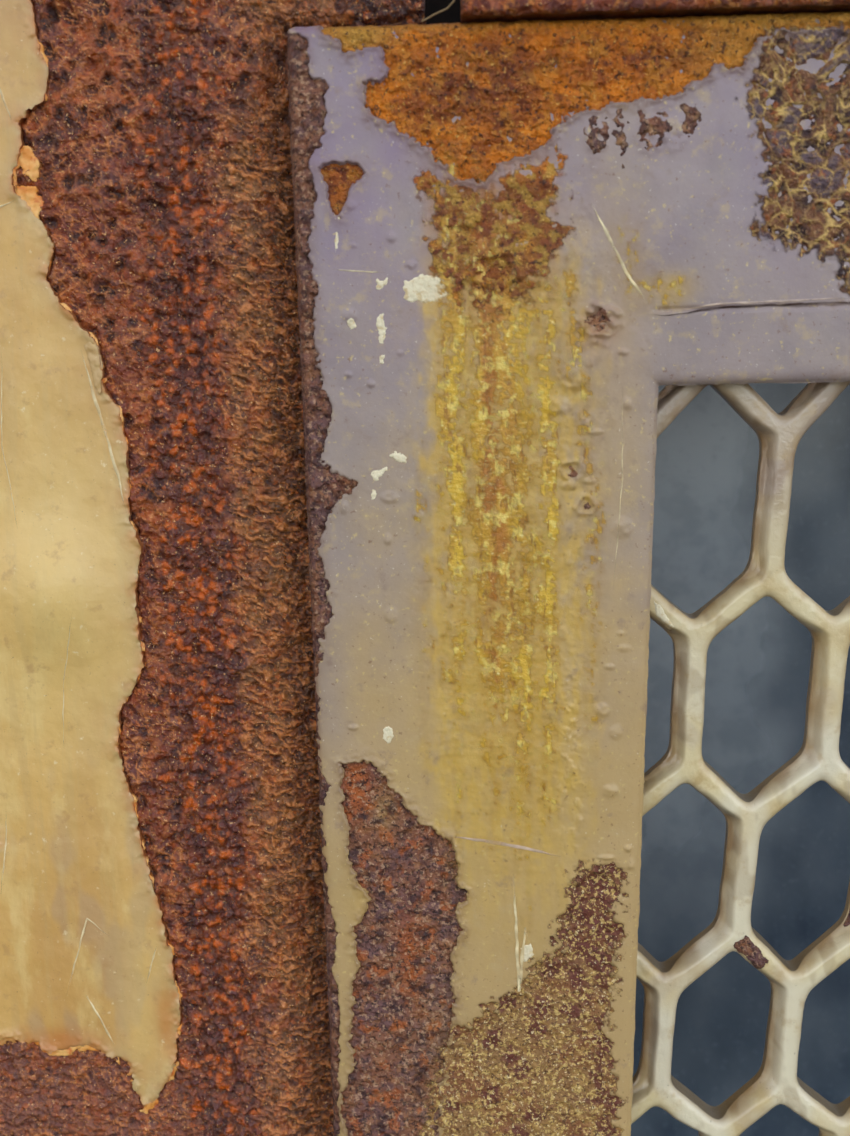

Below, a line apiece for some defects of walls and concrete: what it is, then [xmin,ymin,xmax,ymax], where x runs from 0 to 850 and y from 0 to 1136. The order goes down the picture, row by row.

crack [596,213,640,291]
crack [663,298,850,316]
rust [321,11,850,825]
peeling [0,0,184,1114]
rust [287,34,628,1136]
peeling [520,943,534,962]
rust [734,935,769,969]